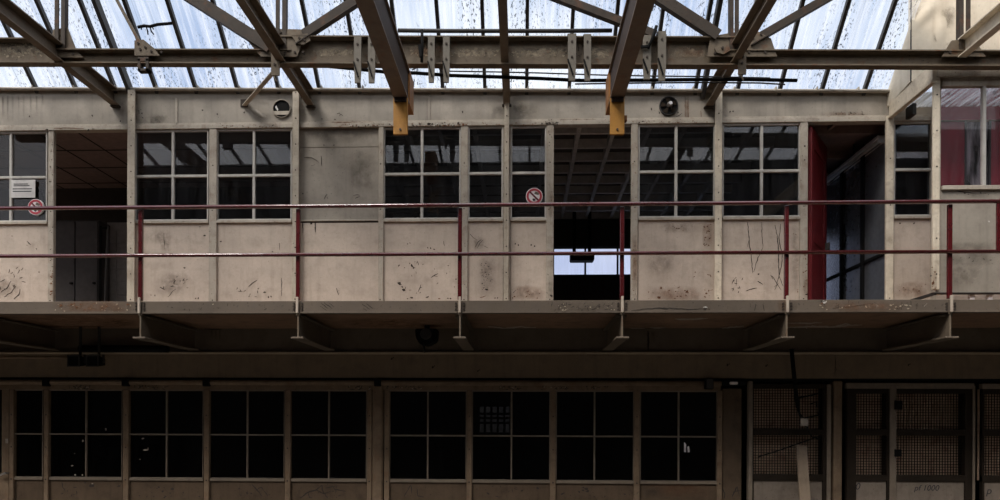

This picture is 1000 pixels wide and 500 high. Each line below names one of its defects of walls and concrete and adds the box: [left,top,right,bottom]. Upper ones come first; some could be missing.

crack [747,222,783,311]